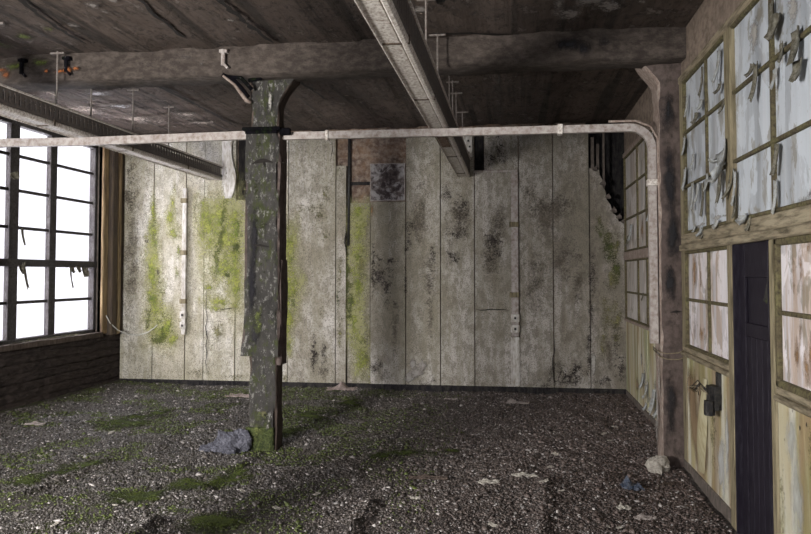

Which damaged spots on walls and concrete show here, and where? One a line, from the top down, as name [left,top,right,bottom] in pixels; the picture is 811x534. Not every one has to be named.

leakage [663,151,679,254]
leakage [214,208,226,268]
leakage [248,219,257,308]
leakage [665,269,675,298]
leakage [154,314,178,345]
leakage [666,386,676,429]